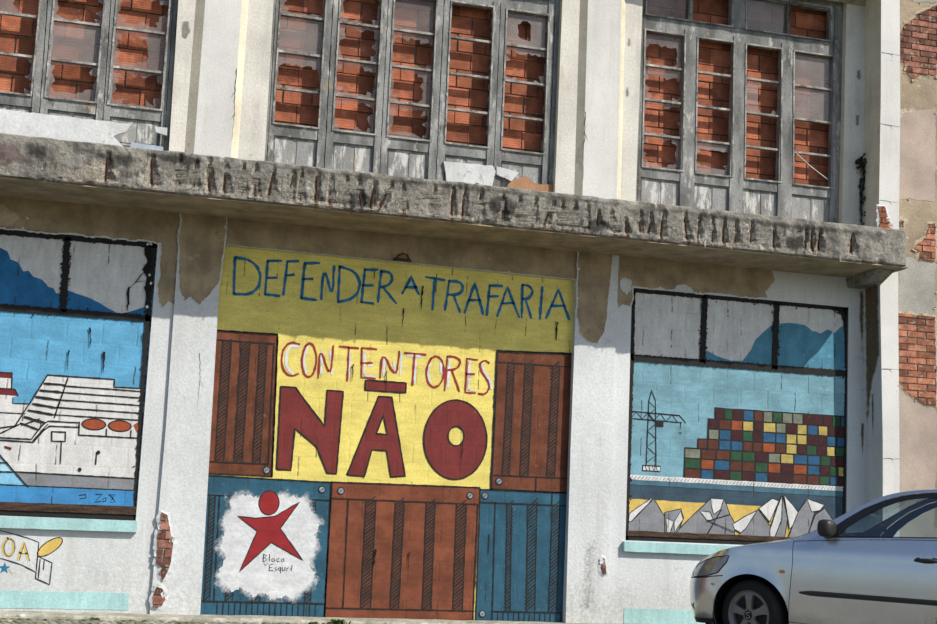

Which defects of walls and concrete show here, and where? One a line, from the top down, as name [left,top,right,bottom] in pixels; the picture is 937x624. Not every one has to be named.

spalling [900,2,937,82]
spalling [59,152,128,185]
peeling [0,197,775,344]
spalling [144,154,832,254]
spalling [876,204,937,264]
spalling [898,307,937,408]
spalling [149,510,178,611]